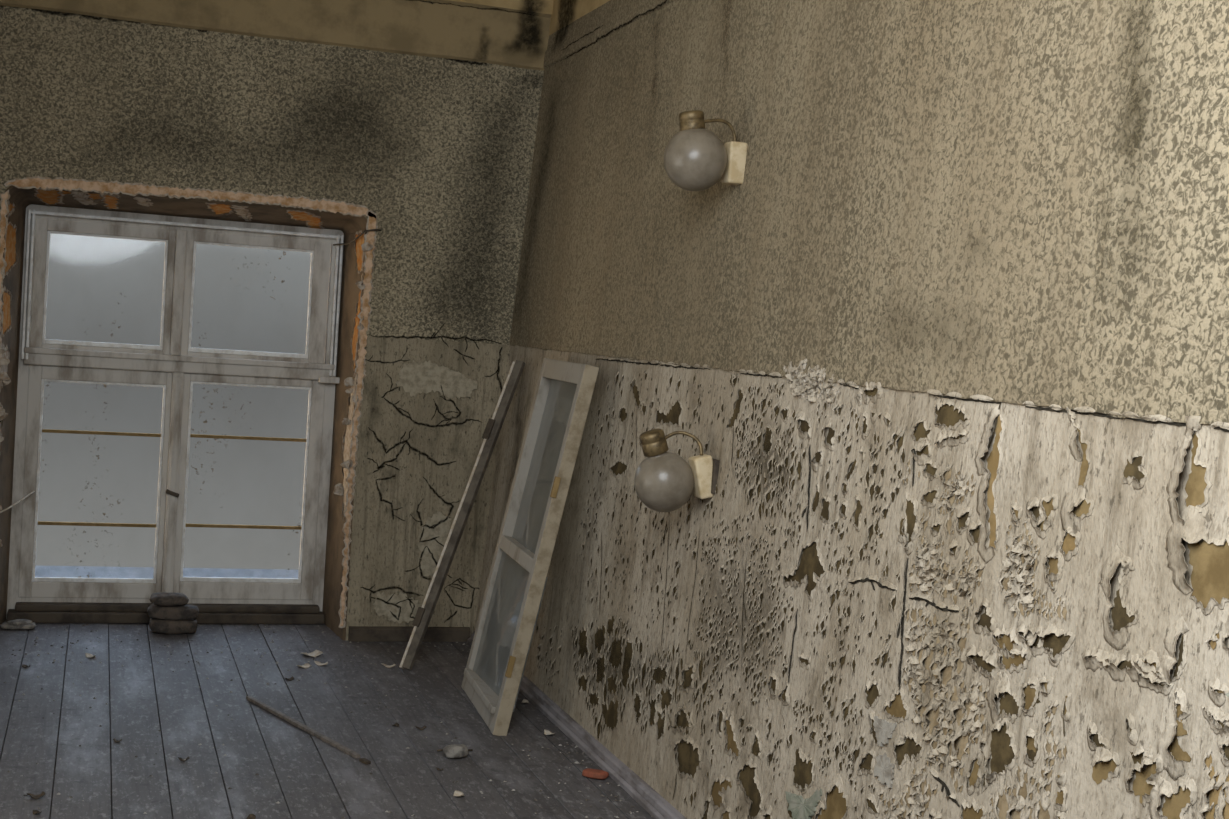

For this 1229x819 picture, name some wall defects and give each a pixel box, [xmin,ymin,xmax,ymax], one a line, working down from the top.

mould [513,0,575,52]
crack [560,0,667,61]
flaking render [0,176,378,628]
crack [361,323,502,623]
peeling [535,358,1229,819]